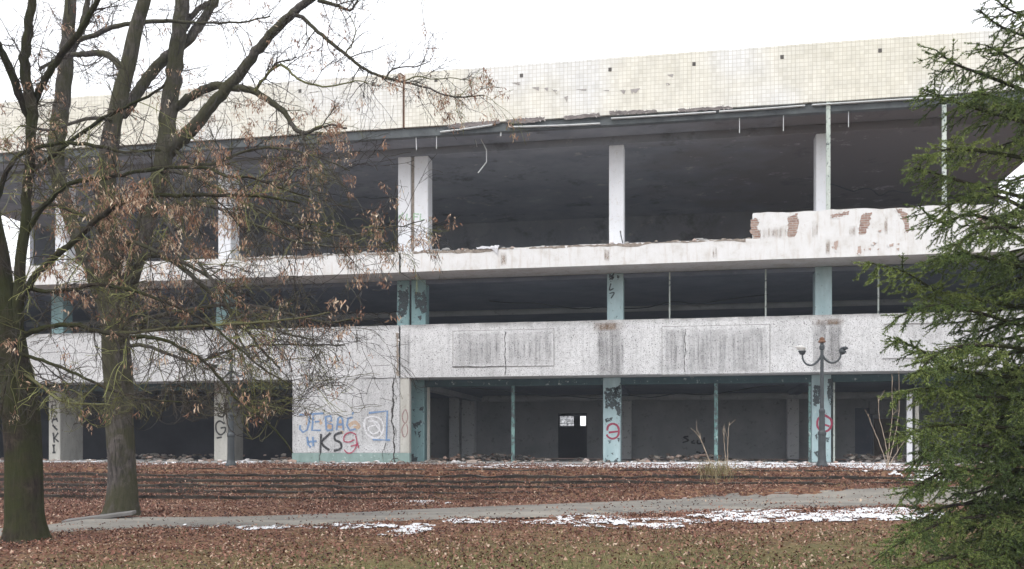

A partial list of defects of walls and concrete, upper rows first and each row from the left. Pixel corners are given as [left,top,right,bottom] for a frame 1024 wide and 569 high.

spalling [786,213,799,237]
spalling [830,207,909,255]
crack [367,377,399,463]
peeling [604,382,621,422]